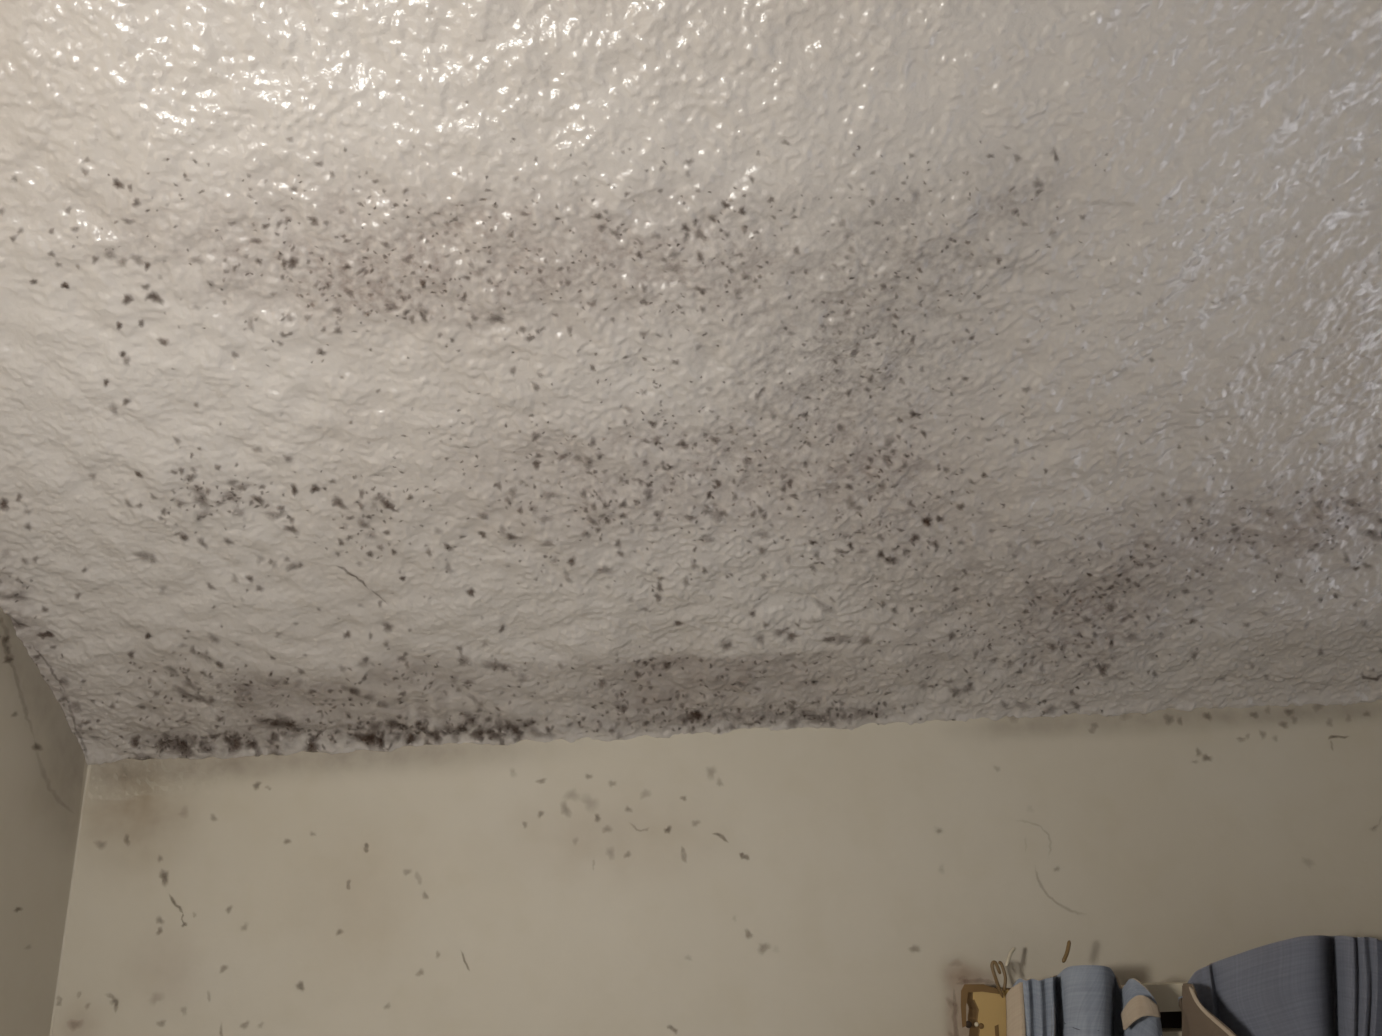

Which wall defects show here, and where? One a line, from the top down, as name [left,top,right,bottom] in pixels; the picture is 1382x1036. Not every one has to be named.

damp [357,722,395,747]